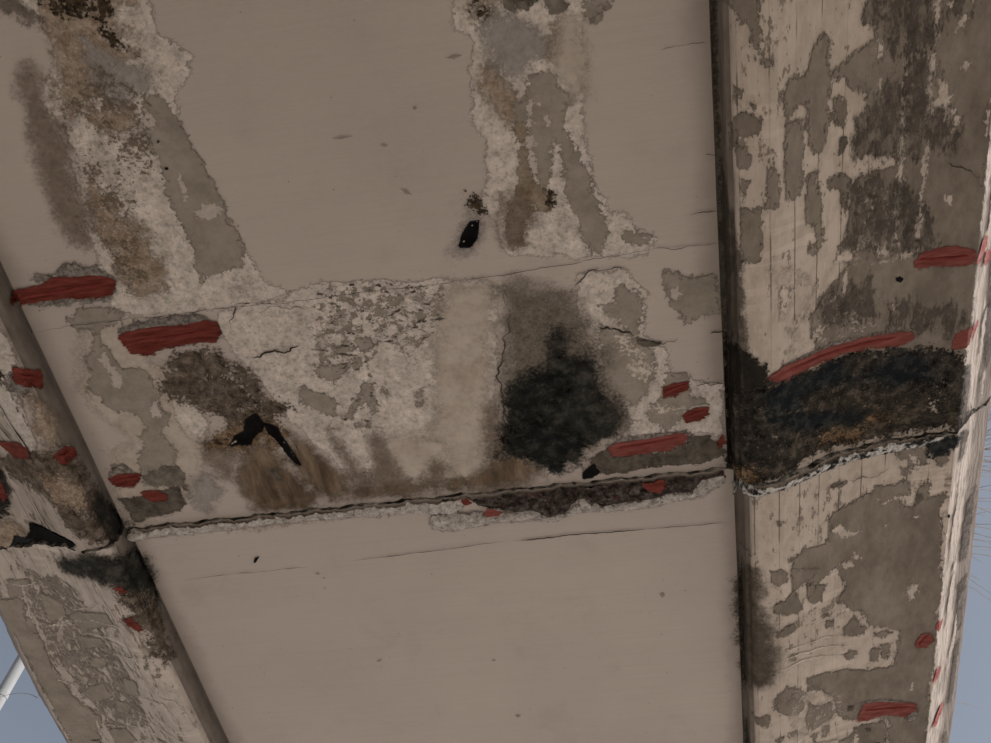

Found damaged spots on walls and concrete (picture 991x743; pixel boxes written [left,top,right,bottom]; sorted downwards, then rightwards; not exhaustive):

peeling [0,262,223,523]
peeling [139,91,246,284]
peeling [298,279,447,433]
damp [0,0,973,514]
peeling [498,67,655,256]
peeling [461,282,728,517]
peeling [738,0,991,399]
damp [983,259,991,367]
damp [0,392,725,667]
peeling [751,443,961,743]
damp [948,574,967,705]
damp [959,485,977,562]